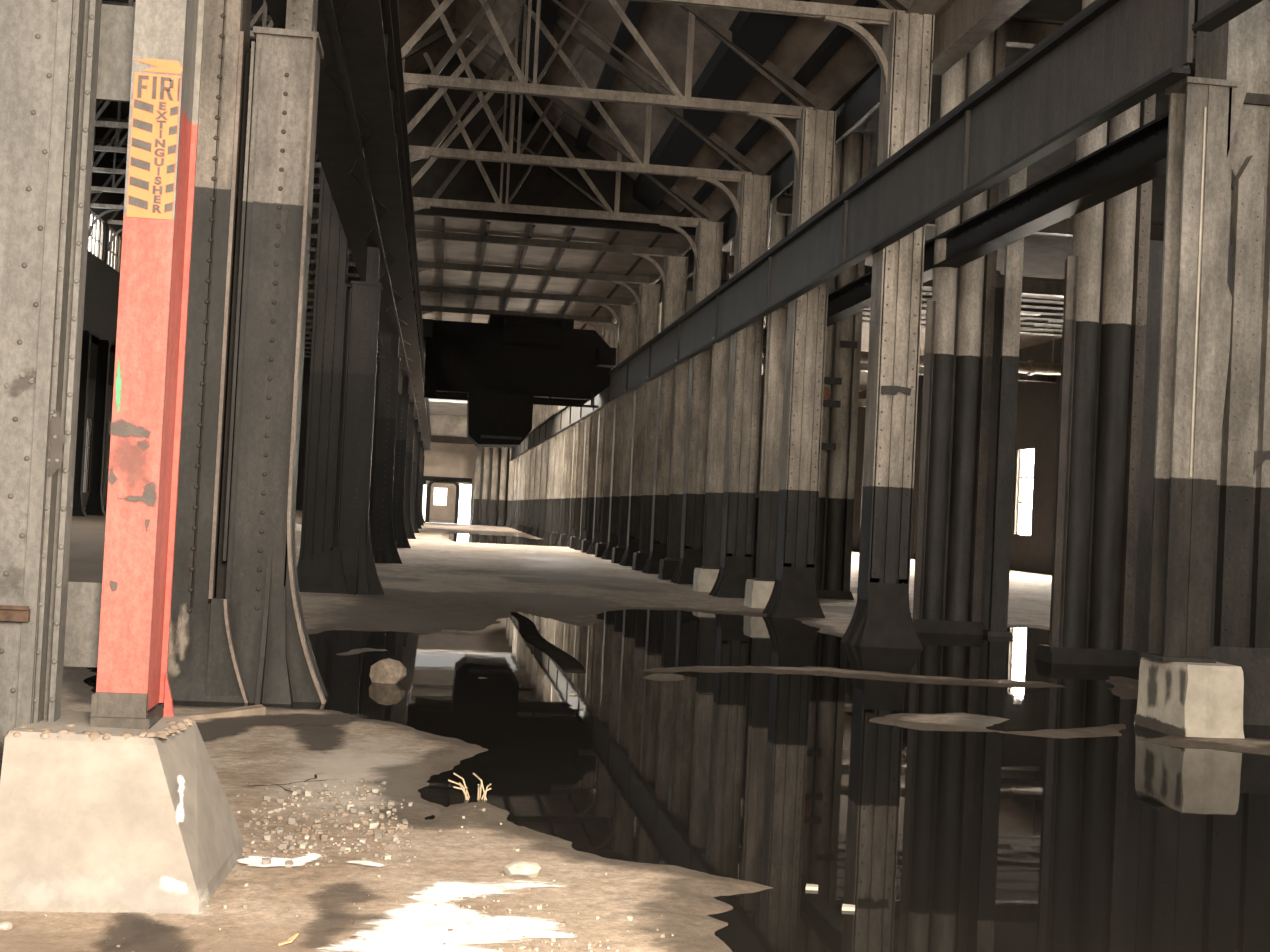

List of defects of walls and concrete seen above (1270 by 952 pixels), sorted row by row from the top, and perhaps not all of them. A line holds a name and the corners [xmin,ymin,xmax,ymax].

peeling [108,419,157,531]
peeling [168,607,187,675]